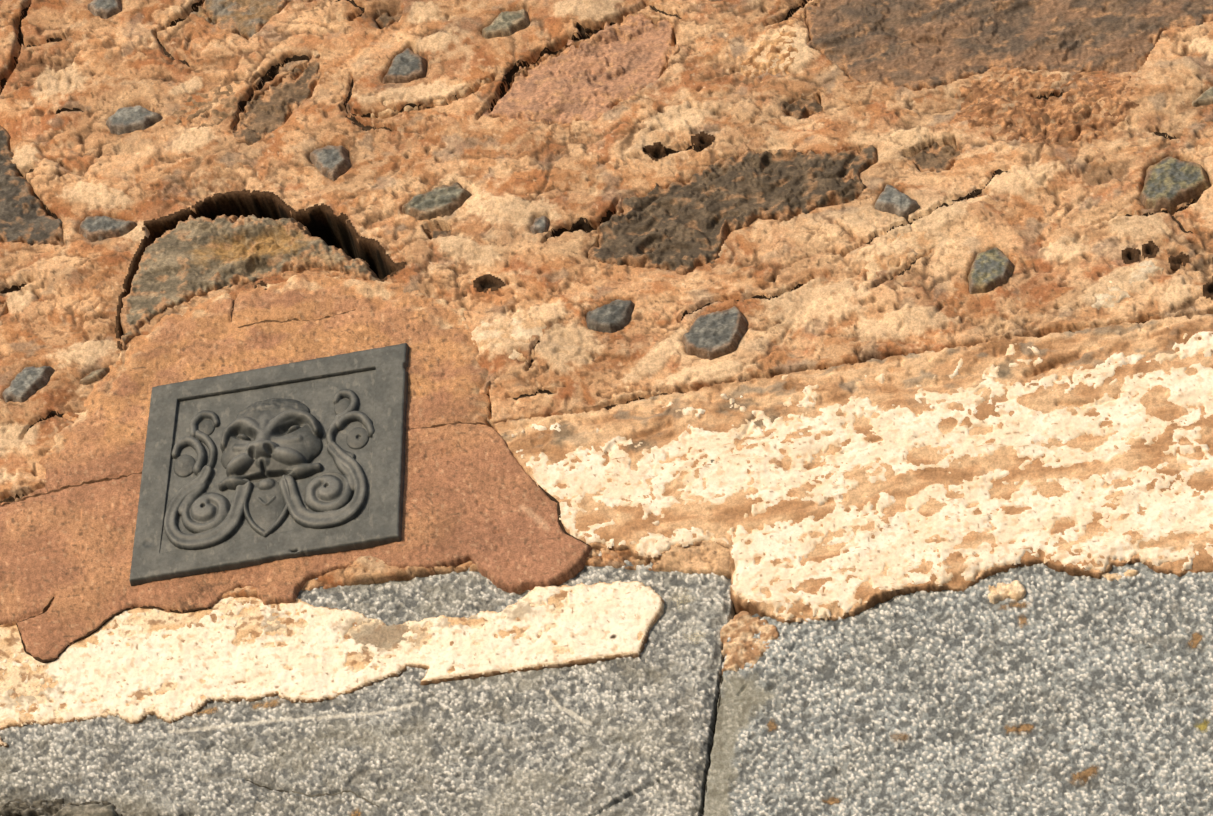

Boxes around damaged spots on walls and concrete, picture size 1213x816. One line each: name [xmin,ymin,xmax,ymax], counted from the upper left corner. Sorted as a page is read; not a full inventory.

crack [0,4,62,95]
crack [343,22,616,131]
crack [645,5,682,19]
crack [18,169,58,219]
crack [231,297,356,328]
flaking render [512,331,1213,622]
flaking render [0,581,662,746]
crack [702,613,737,816]
spalling [0,798,123,816]
crack [246,780,379,808]